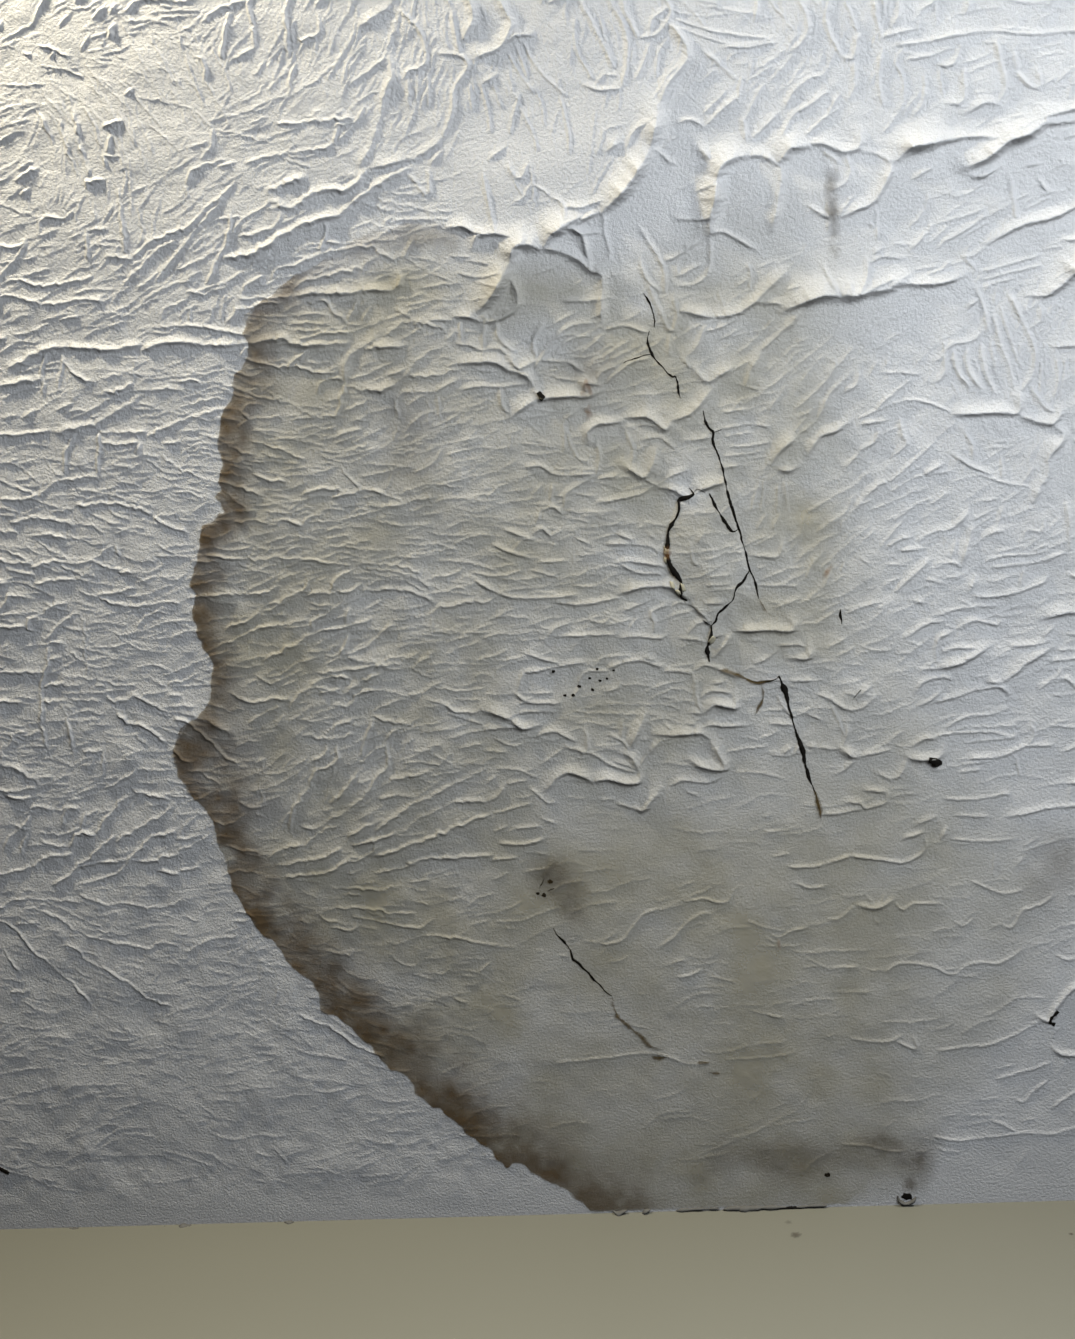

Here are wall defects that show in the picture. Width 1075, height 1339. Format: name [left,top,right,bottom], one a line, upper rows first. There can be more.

water stain [190,395,245,685]
crack [624,294,822,818]
water stain [174,712,613,1210]
crack [553,928,666,1060]